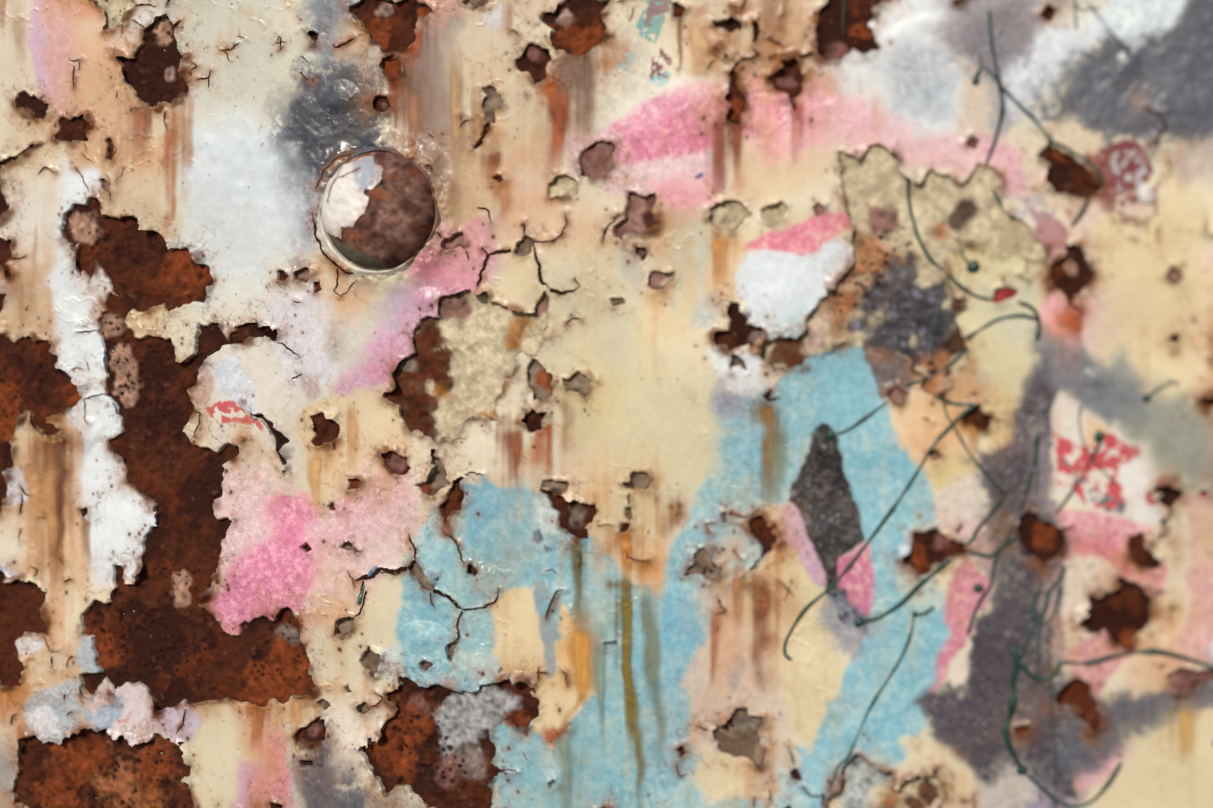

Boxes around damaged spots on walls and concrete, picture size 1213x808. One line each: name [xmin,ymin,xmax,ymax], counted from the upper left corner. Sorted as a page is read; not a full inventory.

corrosion [0,90,96,557]
peeling [378,284,595,501]
crack [435,207,581,324]
peeling [728,139,1048,403]
peeling [888,386,907,407]
corrosion [0,564,52,716]
corrosion [63,198,332,766]
crack [348,534,416,618]
crack [449,536,465,563]
crack [430,589,499,642]
corrosion [10,722,201,808]
corrosion [355,670,563,808]